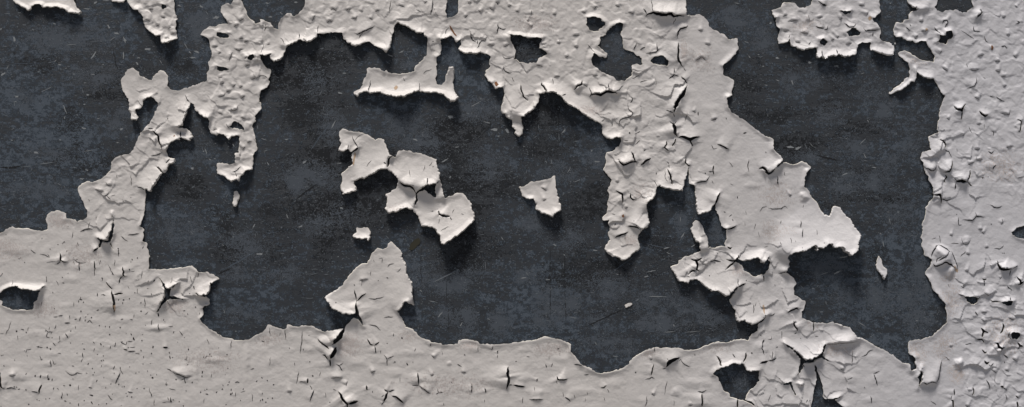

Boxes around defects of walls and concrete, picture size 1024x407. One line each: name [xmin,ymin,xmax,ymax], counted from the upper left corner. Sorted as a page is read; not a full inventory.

crack [0,118,263,403]
peeling [0,0,765,373]
crack [269,258,609,407]
crack [494,1,817,365]
peeling [654,0,983,407]
peeling [1012,226,1024,239]